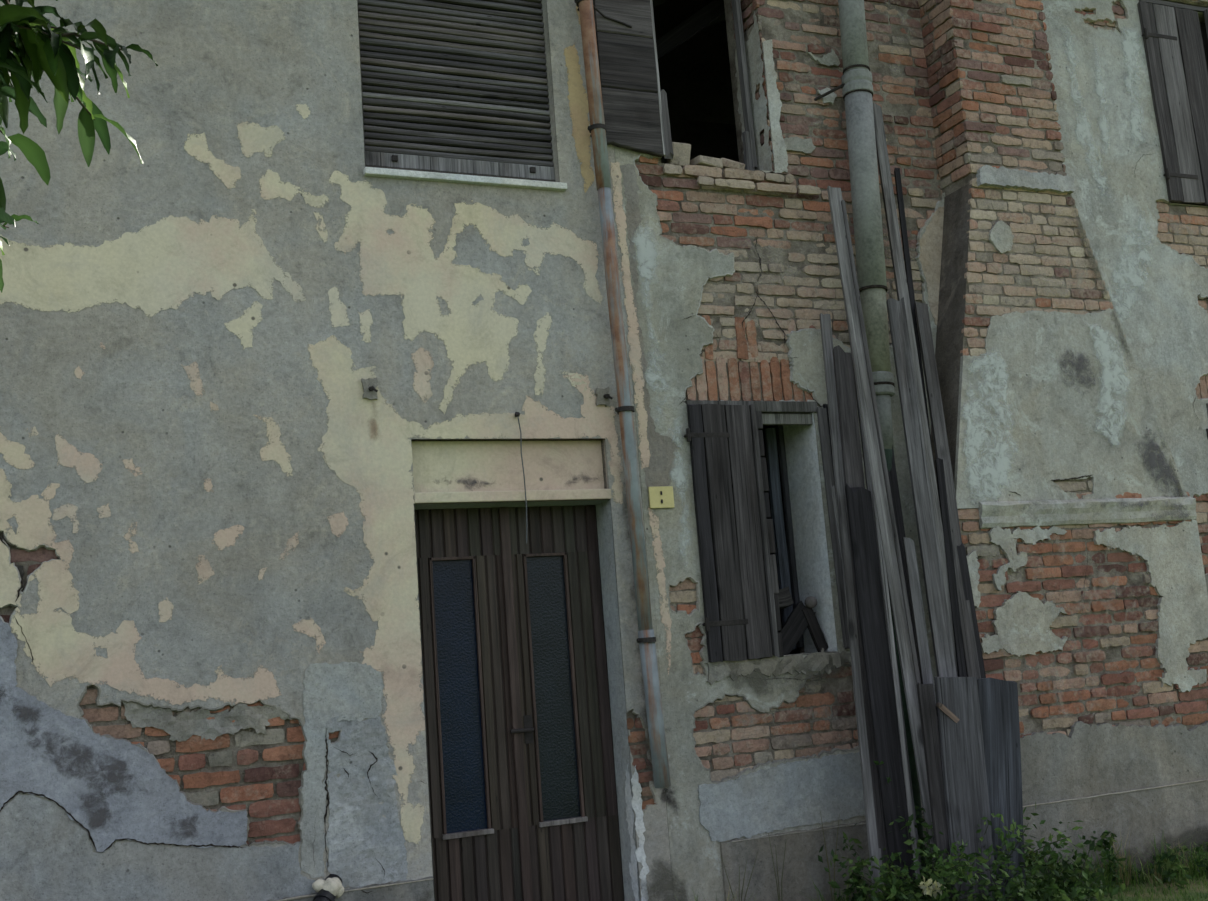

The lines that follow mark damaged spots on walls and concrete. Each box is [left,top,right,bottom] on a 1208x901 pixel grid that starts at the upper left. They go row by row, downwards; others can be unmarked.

peeling [564,43,595,193]
flaking render [611,0,857,488]
flaking render [864,0,944,347]
flaking render [1155,197,1208,270]
peeling [0,121,624,847]
peeling [648,508,708,677]
flaking render [958,492,1208,738]
leakage [13,706,132,829]
crack [0,791,246,853]
crack [313,731,378,894]
flaking render [627,707,660,812]
flaking render [692,663,859,784]